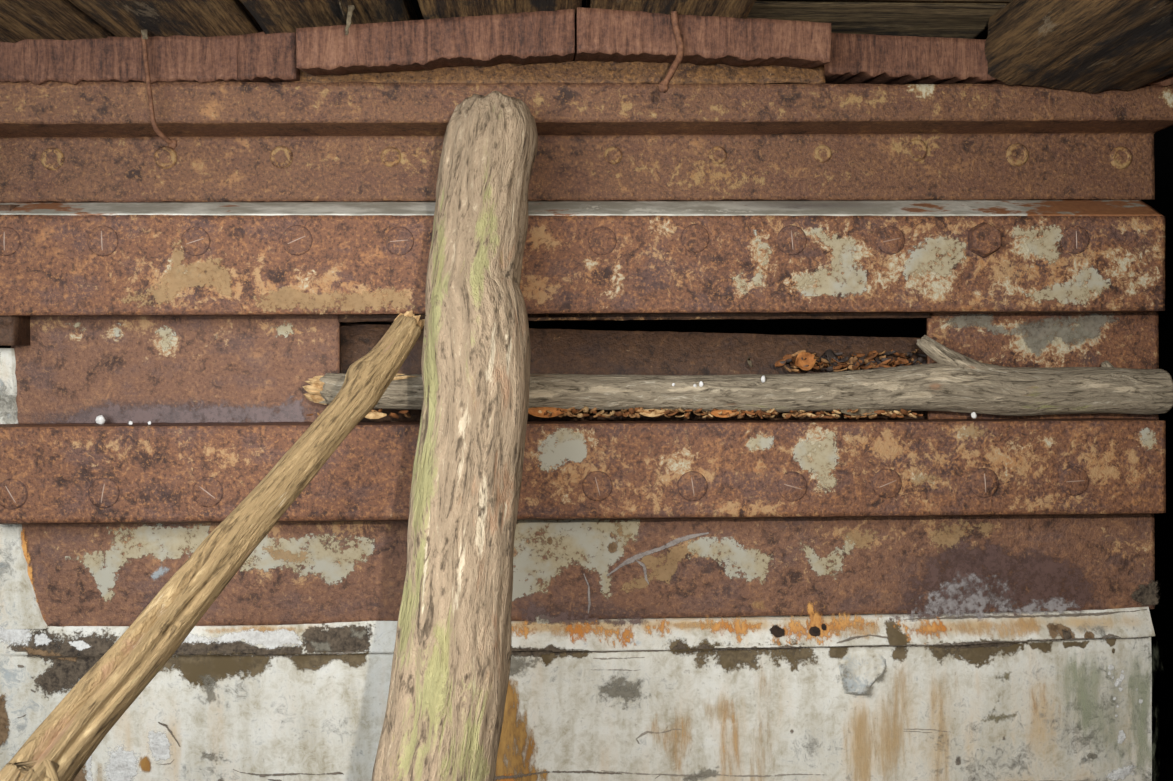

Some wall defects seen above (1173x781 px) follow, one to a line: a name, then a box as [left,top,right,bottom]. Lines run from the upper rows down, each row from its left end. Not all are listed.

corrosion [294,54,825,84]
corrosion [21,530,38,602]
leakage [159,627,369,703]
corrosion [511,621,535,639]
corrosion [552,618,761,648]
leakage [667,639,848,672]
corrosion [772,603,877,646]
leakage [884,620,910,661]
leakage [925,639,1089,668]
corrosion [494,681,547,781]